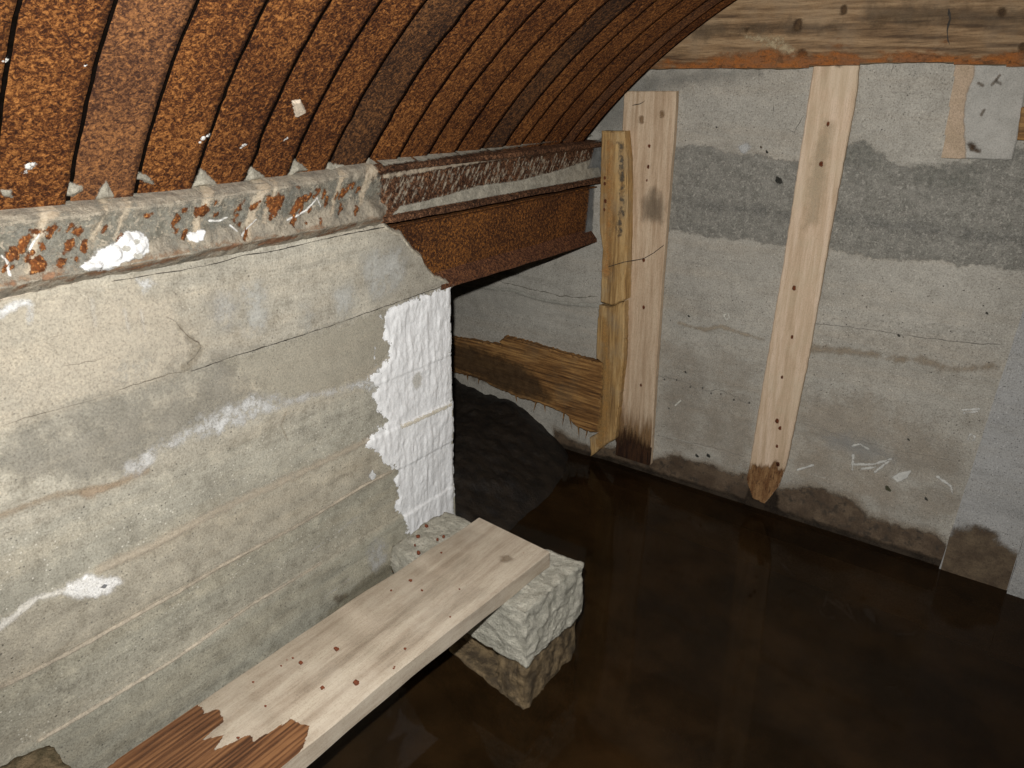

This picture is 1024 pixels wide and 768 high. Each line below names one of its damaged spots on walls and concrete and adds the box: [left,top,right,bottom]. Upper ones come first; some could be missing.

corrosion [0,182,381,291]
water stain [0,160,492,276]
crack [115,226,389,281]
water stain [669,143,799,245]
water stain [829,140,1024,270]
water stain [0,314,388,516]
crack [6,286,441,425]
peeling [353,224,455,535]
water stain [554,319,1017,590]
efflorescence [0,574,122,630]